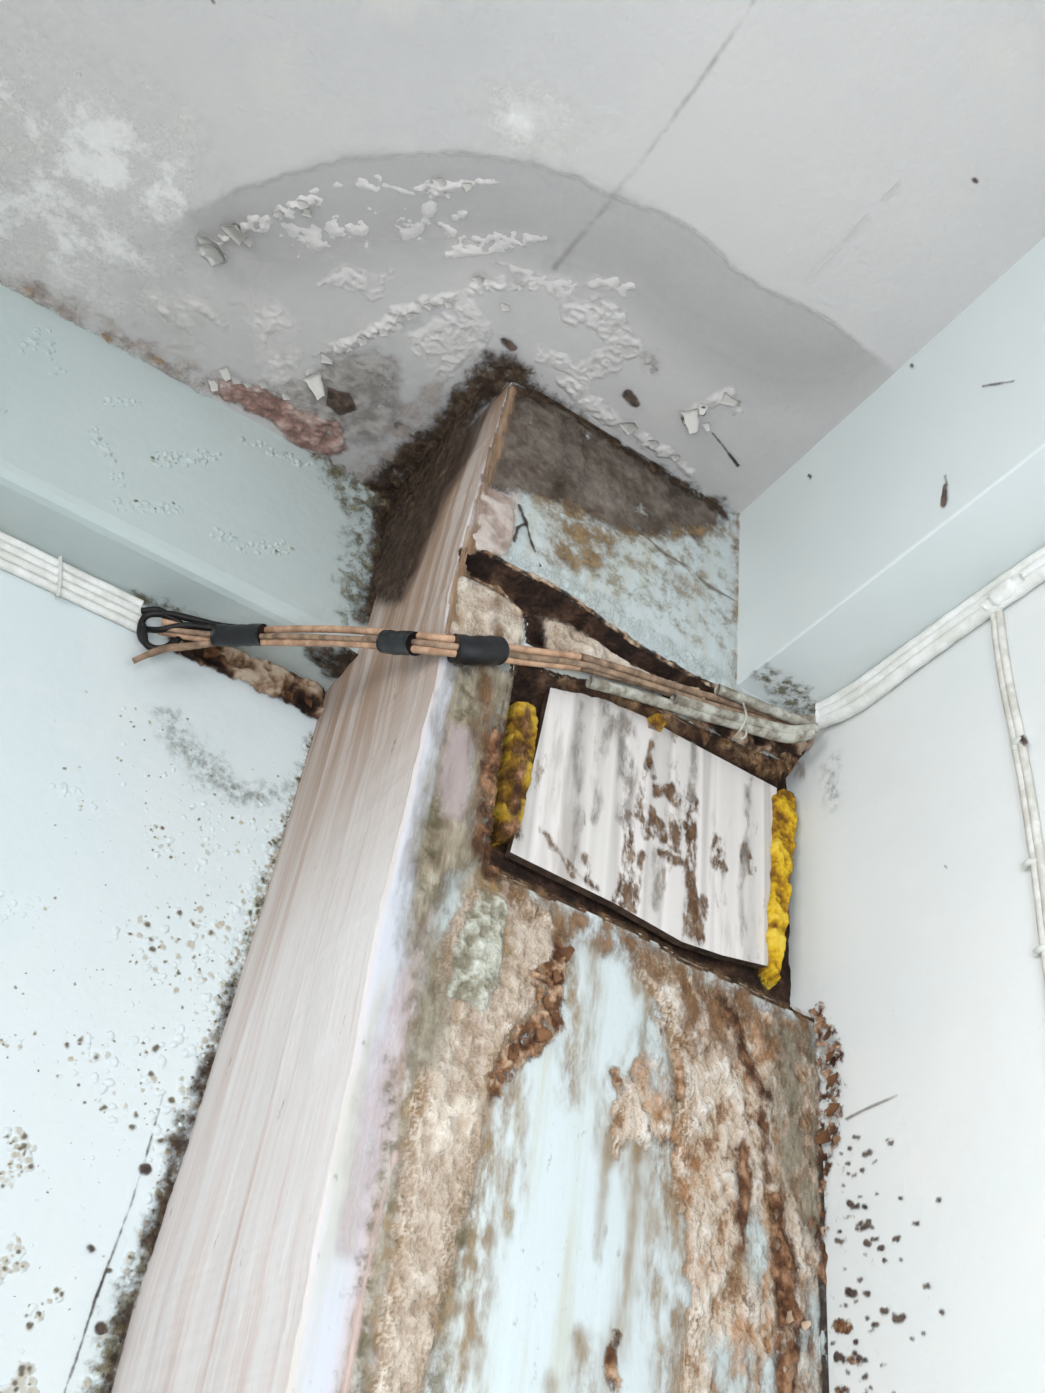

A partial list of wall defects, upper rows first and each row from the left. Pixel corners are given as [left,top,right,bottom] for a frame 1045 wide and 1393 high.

peeling [195,174,499,266]
water stain [0,76,860,374]
peeling [680,385,744,434]
flaking render [450,576,525,645]
flaking render [473,487,737,701]
spalling [495,664,814,791]
water stain [405,664,533,1067]
water stain [79,735,314,1393]
flaking render [342,796,826,1393]
water stain [834,1135,902,1263]
water stain [459,1300,481,1383]
water stain [831,1277,906,1393]